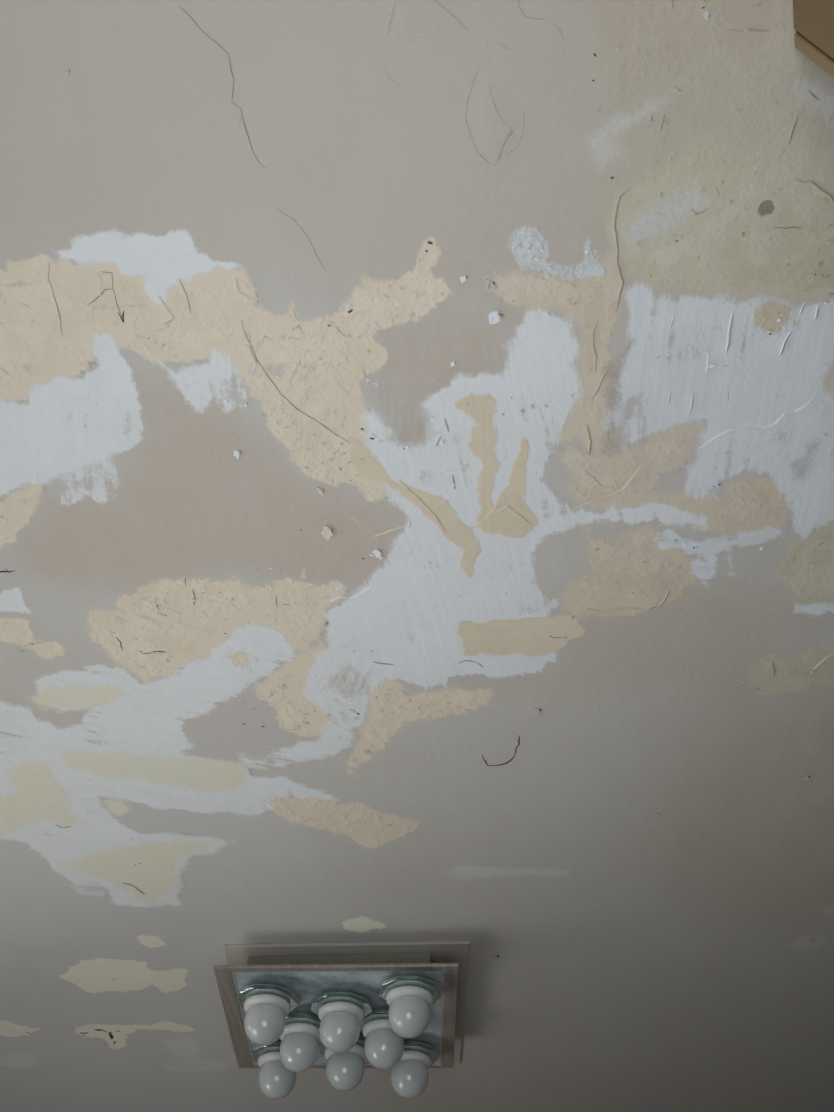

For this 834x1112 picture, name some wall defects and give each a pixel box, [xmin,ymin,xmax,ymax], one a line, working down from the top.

crack [179,7,265,168]
peeling [560,0,834,340]
peeling [0,223,548,598]
peeling [568,330,646,466]
peeling [0,562,373,676]
peeling [452,609,592,661]
peeling [22,679,128,714]
crack [482,735,520,766]
peeling [0,756,228,910]
peeling [261,789,436,854]
peeling [51,929,197,996]
peeling [67,1017,208,1053]